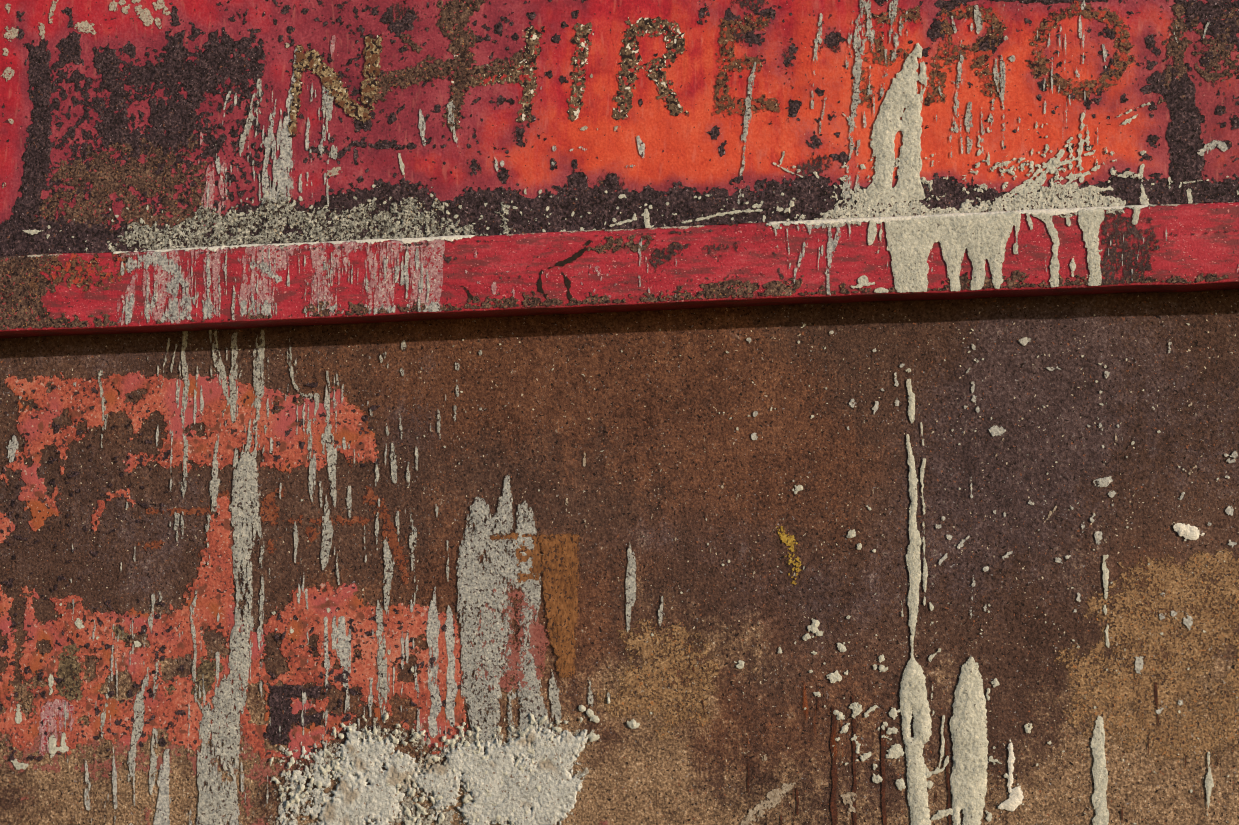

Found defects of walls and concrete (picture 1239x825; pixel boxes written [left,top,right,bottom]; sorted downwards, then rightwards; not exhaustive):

peeling [0,3,19,81]
peeling [38,0,59,39]
peeling [74,20,97,34]
peeling [109,0,171,29]
peeling [0,370,410,585]
peeling [0,488,550,761]
rust [597,617,720,741]
rust [1054,549,1239,774]
rust [803,682,857,825]
rust [881,729,890,825]
rust [935,724,951,825]